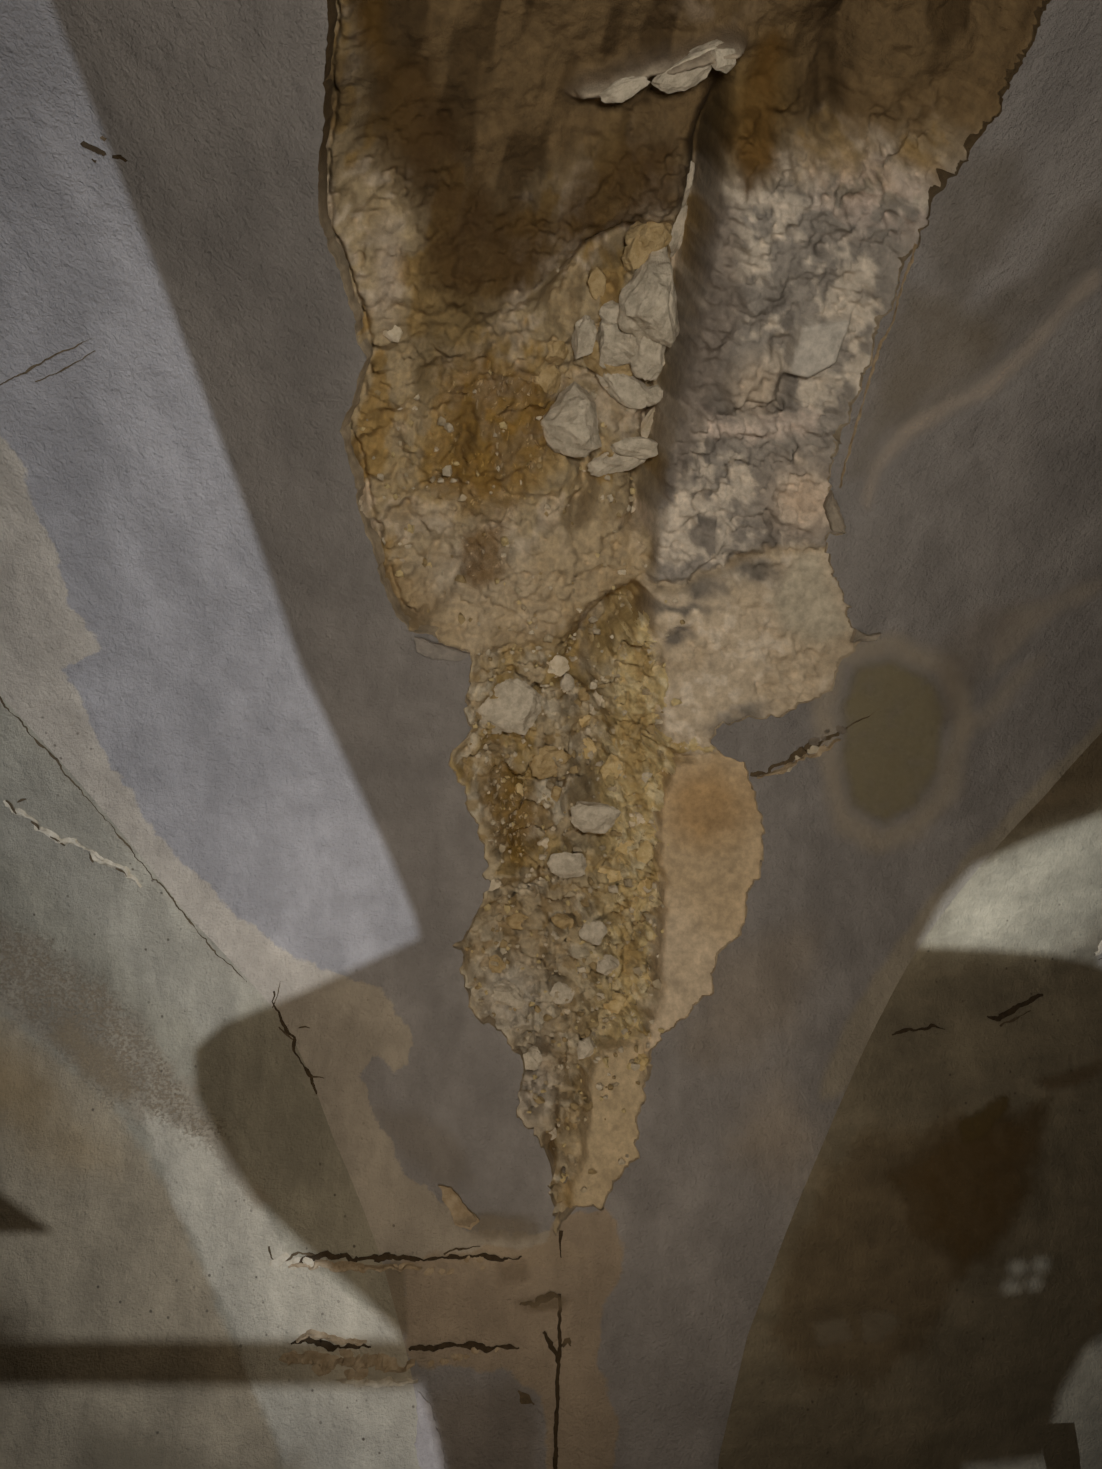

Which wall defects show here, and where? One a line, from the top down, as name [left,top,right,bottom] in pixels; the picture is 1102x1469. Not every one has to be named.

spalling [318,0,1051,1236]
crack [750,709,880,779]
crack [0,696,323,1094]
crack [1094,940,1102,960]
crack [268,1230,571,1469]